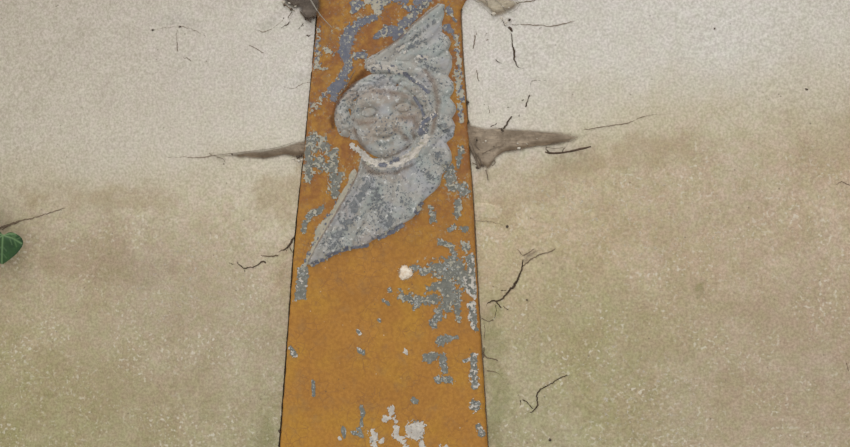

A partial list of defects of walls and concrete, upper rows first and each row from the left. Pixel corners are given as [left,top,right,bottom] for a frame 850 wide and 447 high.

peeling [309,0,465,123]
crack [461,11,488,120]
crack [488,0,574,129]
crack [237,16,317,447]
peeling [294,96,479,385]
crack [469,149,555,447]
peeling [338,404,427,447]
crack [520,375,568,413]